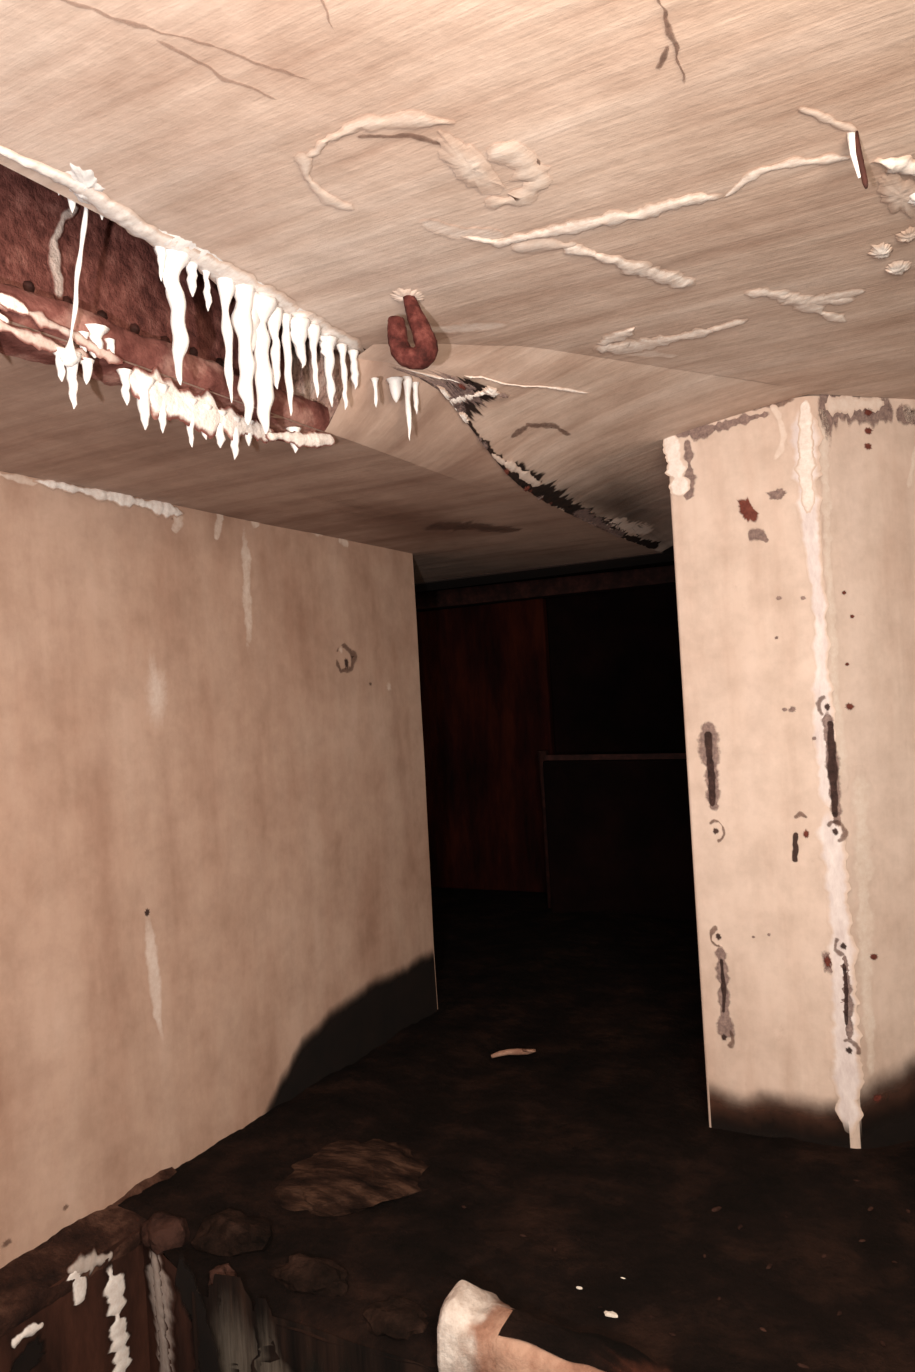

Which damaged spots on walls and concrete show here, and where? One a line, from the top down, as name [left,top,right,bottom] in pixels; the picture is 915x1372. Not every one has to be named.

crack [657,0,685,78]
damp [47,205,79,301]
damp [868,155,915,275]
damp [0,292,301,460]
peeling [396,366,468,385]
spalling [676,399,791,440]
spalling [819,394,915,436]
damp [770,399,879,1138]
damp [10,1321,44,1349]
damp [65,1246,134,1372]
damp [143,1248,295,1372]